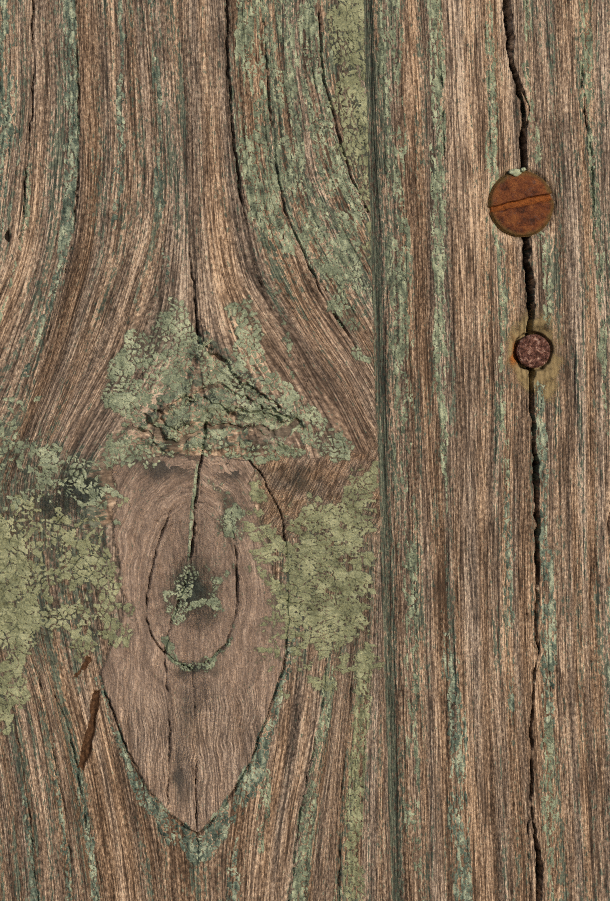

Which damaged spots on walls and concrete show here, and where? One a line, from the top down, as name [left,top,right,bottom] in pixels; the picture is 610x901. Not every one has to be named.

crack [501,3,509,49]
crack [521,238,529,309]
corrosion [508,314,561,401]
crack [146,428,206,682]
crack [217,550,238,651]
crack [195,642,286,841]
crack [527,820,539,896]